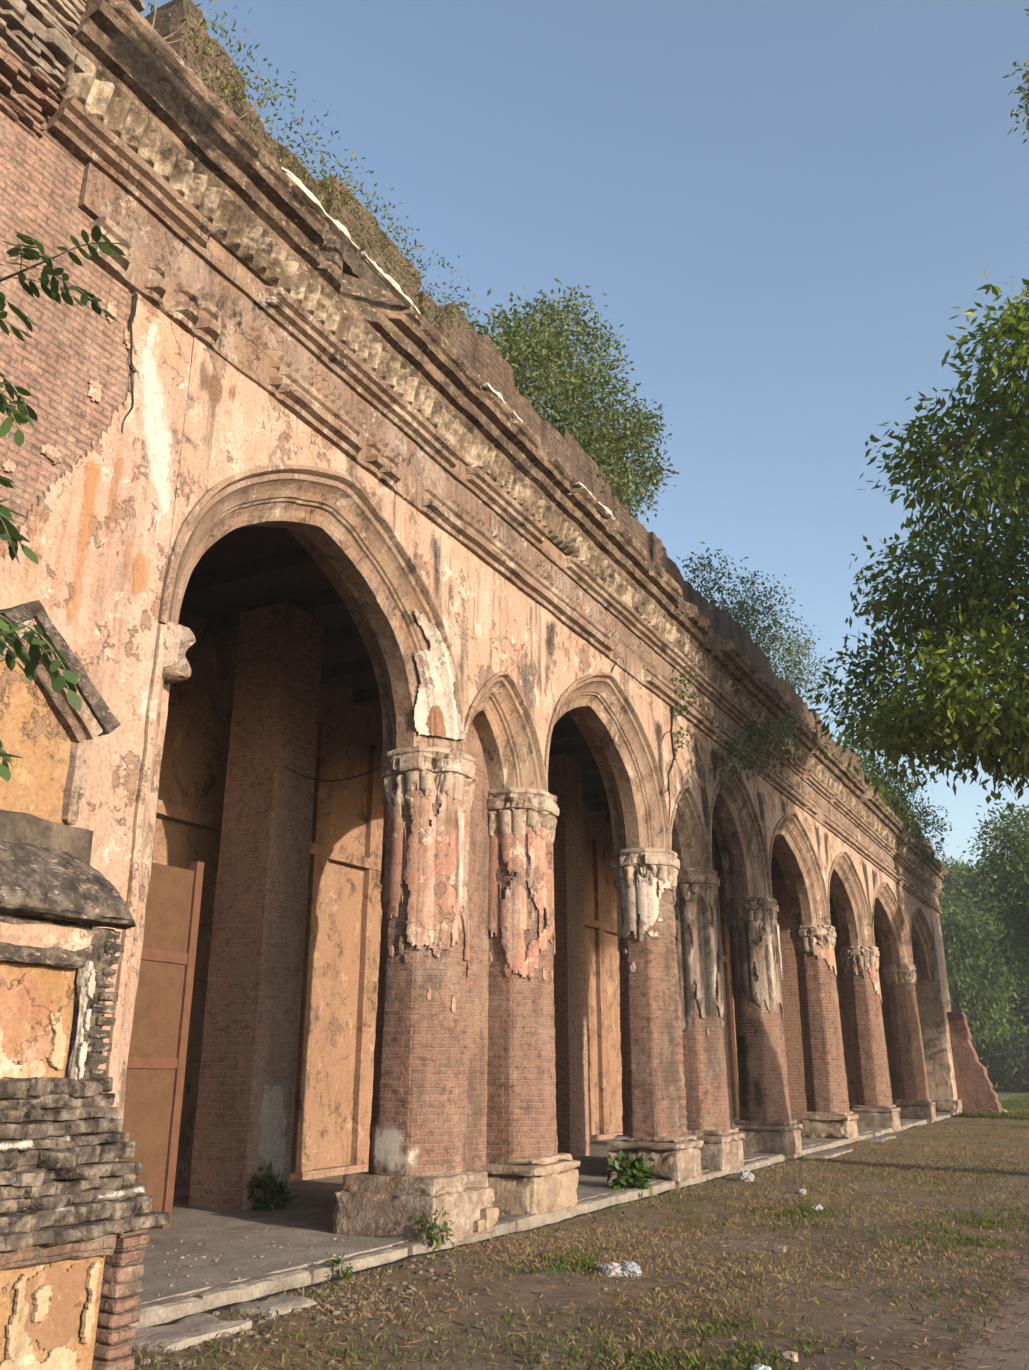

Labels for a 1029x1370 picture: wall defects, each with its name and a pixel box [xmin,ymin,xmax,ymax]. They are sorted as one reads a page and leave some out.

flaking render [0,969,96,1080]
peeling [380,789,469,979]
peeling [488,826,555,981]
peeling [616,878,882,1039]
leakage [371,1127,417,1169]
flaking render [0,1262,101,1370]